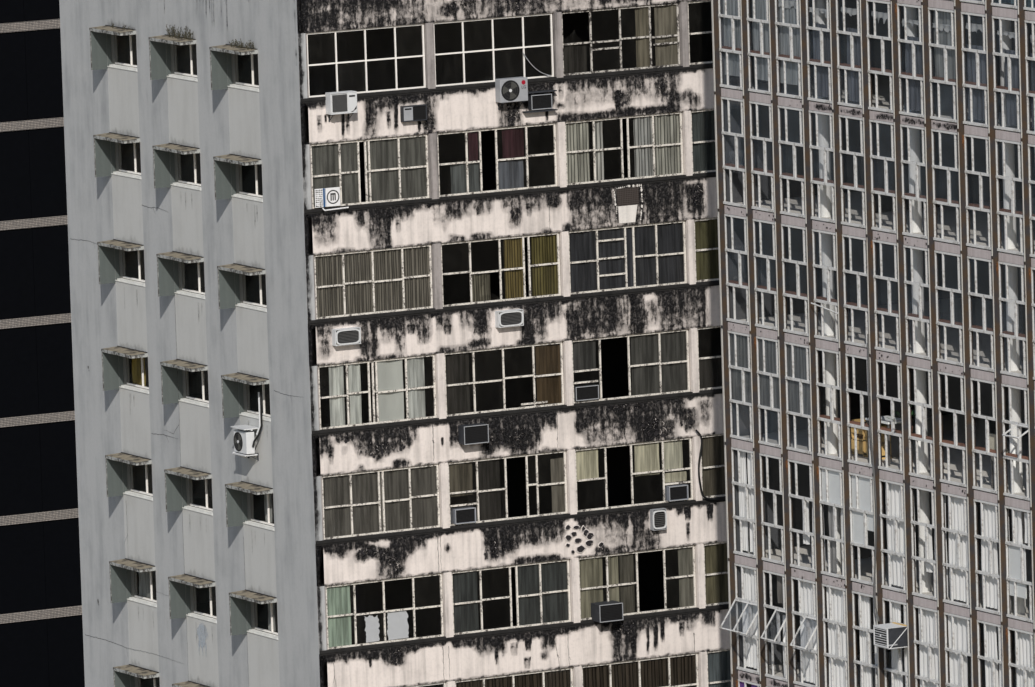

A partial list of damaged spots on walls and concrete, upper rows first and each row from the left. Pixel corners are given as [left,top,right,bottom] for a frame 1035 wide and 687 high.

water stain [294,0,721,687]